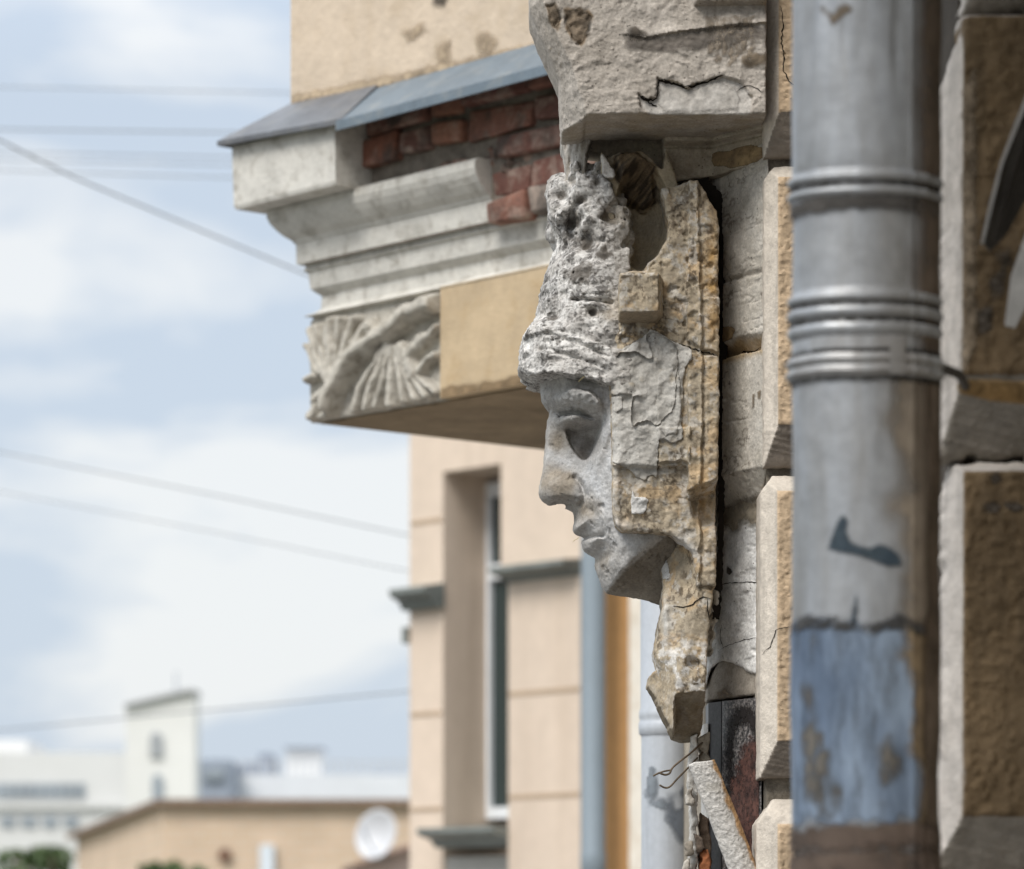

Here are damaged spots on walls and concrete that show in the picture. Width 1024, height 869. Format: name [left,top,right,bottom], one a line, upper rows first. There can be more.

crack [639,75,763,106]
flaking render [611,329,692,481]
flaking render [631,491,649,514]
flaking render [662,560,670,579]